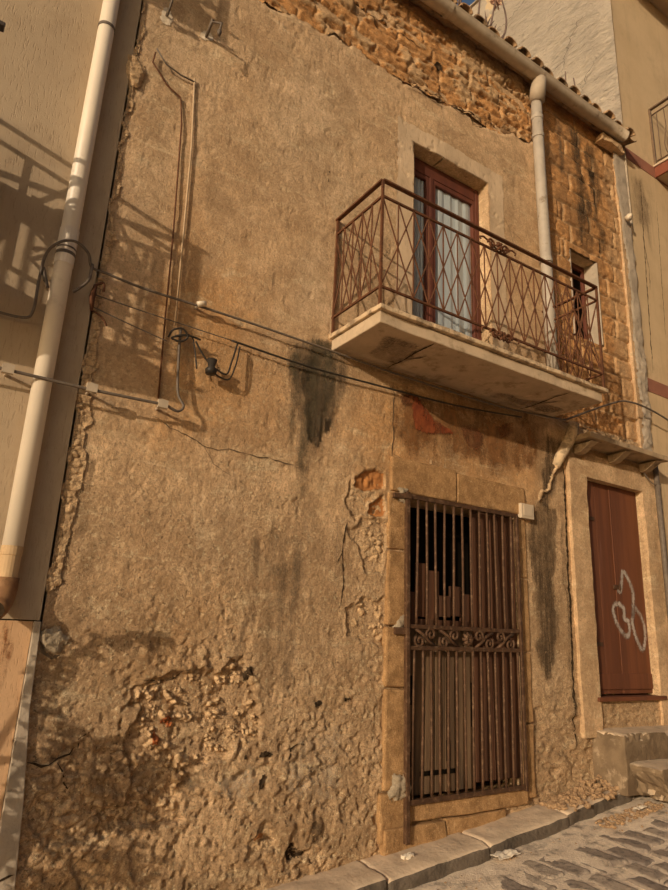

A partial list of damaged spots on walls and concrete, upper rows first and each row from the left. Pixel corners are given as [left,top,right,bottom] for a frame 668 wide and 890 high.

water stain [557,126,605,253]
crack [156,417,299,473]
water stain [289,340,346,470]
peeling [400,394,483,450]
crack [337,524,347,606]
water stain [395,394,564,678]